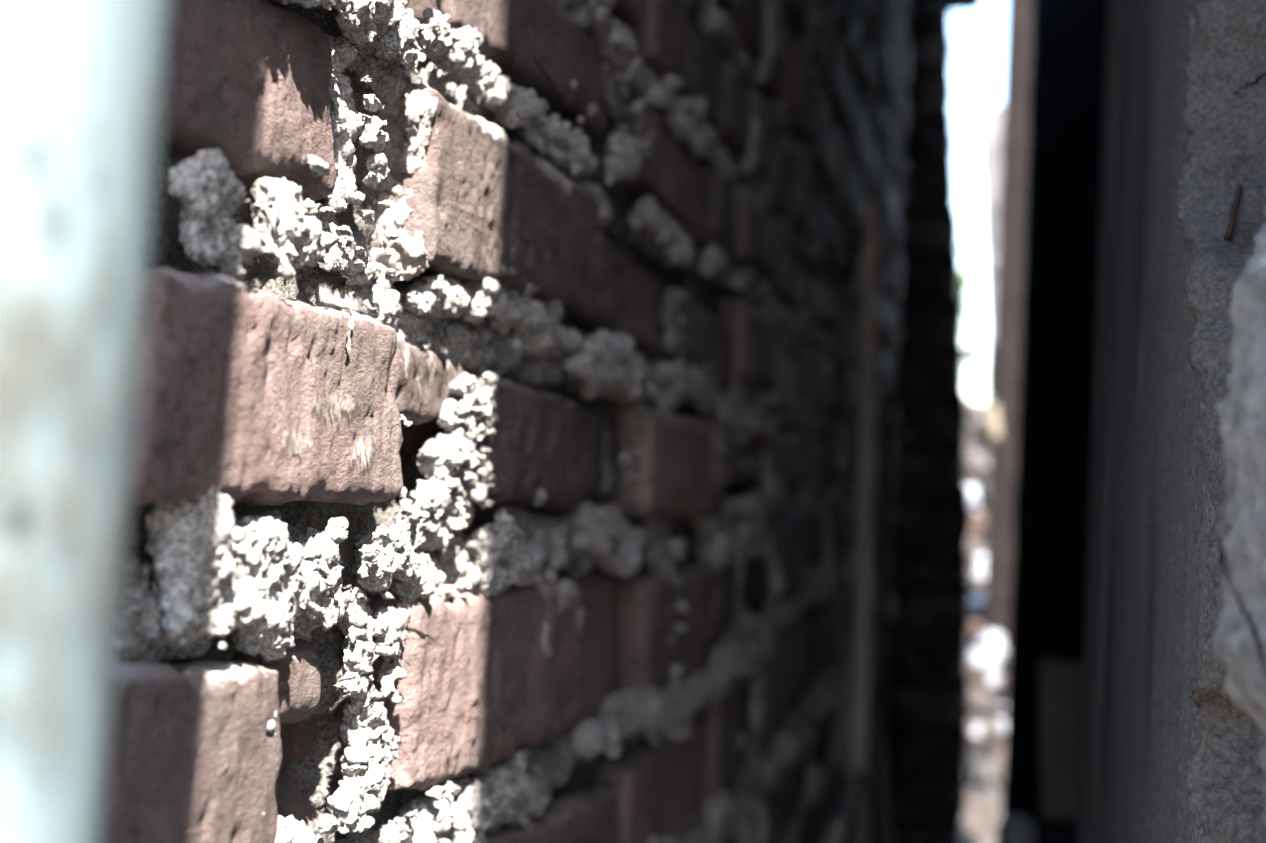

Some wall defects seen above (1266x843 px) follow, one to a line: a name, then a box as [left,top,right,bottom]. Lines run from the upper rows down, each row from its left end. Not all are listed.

spalling [1176,0,1266,843]
crack [1234,73,1266,95]